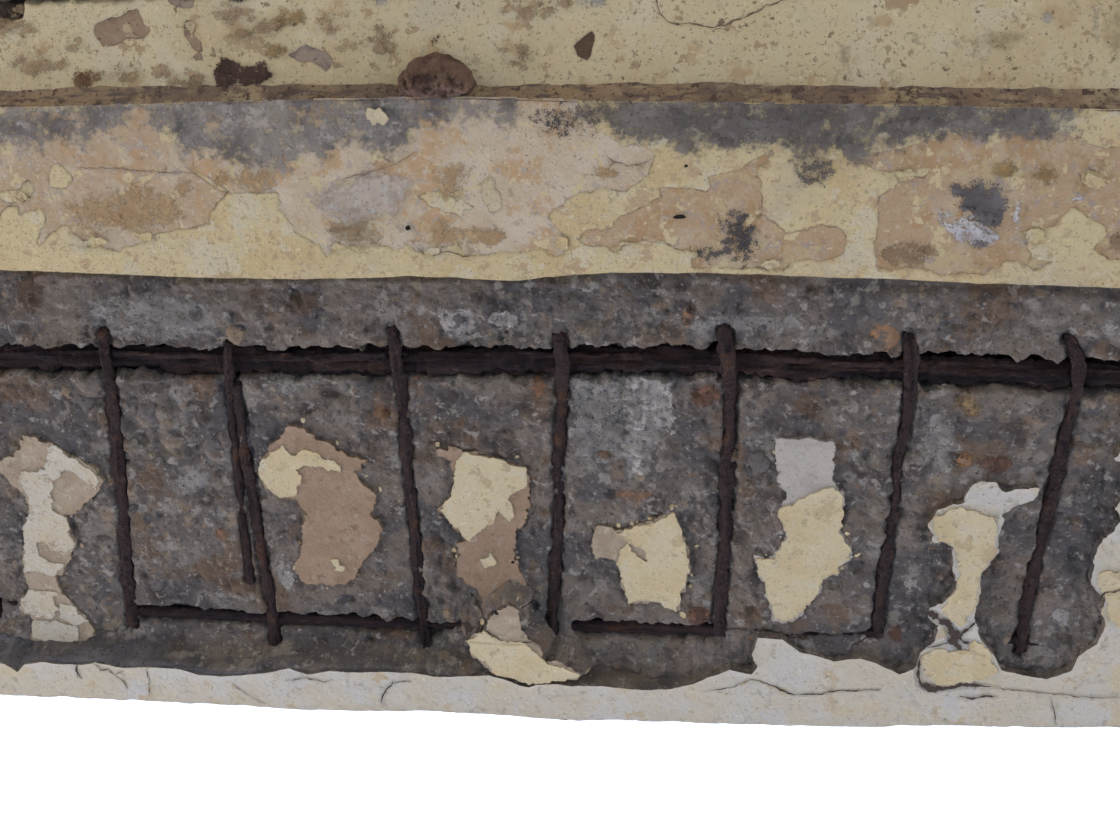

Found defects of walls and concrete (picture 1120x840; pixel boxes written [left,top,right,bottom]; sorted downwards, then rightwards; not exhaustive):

peeling [0,0,37,39]
peeling [7,9,150,76]
peeling [152,0,204,89]
damp [213,57,273,87]
peeling [211,1,280,52]
peeling [288,10,398,71]
peeling [497,44,530,72]
peeling [499,0,570,20]
peeling [574,31,595,60]
crack [656,0,783,31]
damp [0,98,1083,188]
spalling [0,97,1120,685]